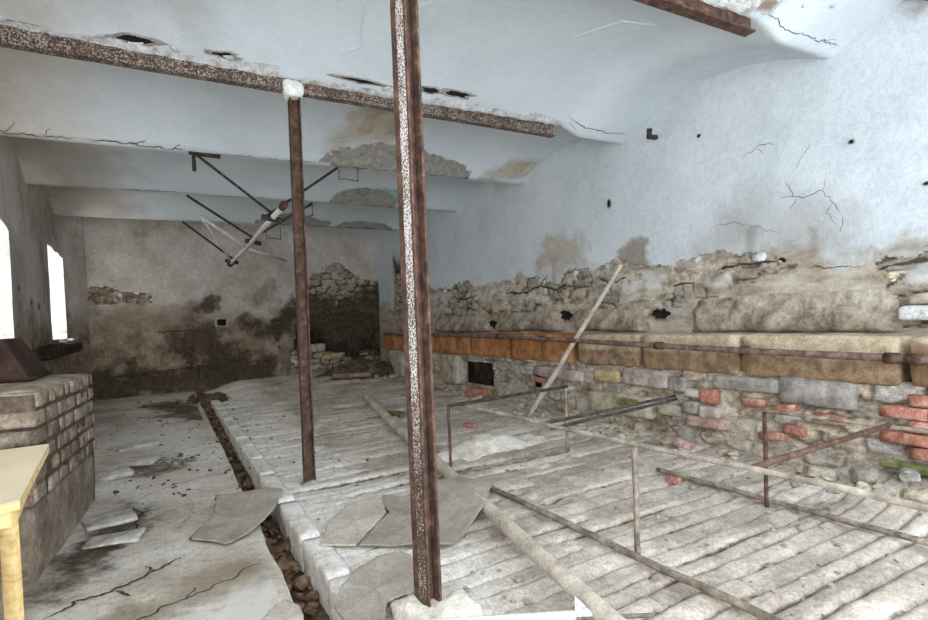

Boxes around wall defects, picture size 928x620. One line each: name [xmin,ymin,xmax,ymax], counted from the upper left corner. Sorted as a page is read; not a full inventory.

spalling [0,15,281,77]
spalling [700,0,761,16]
crack [766,14,837,45]
crack [0,122,194,151]
damp [182,295,221,313]
damp [237,298,296,341]
damp [308,283,380,360]
flaking render [429,241,798,330]
flaking render [875,251,928,328]
damp [92,325,277,400]
crack [42,555,185,620]
crack [137,560,262,620]